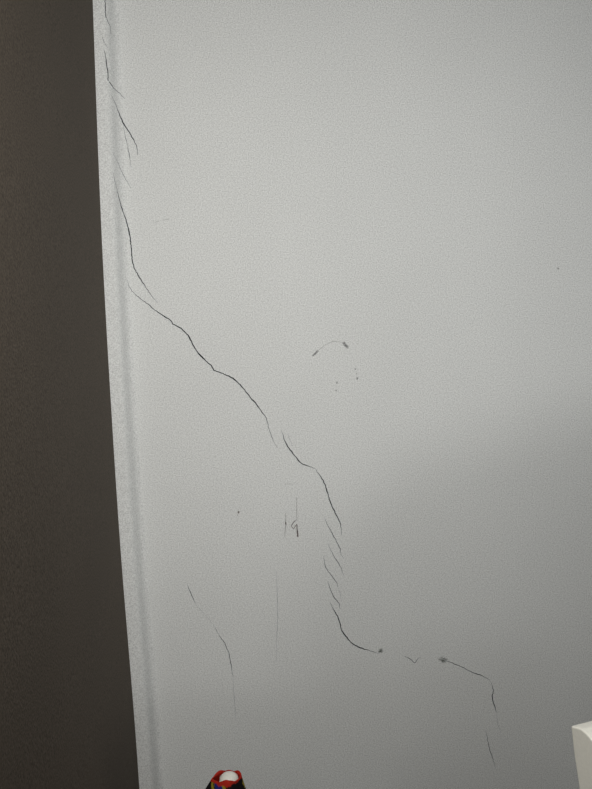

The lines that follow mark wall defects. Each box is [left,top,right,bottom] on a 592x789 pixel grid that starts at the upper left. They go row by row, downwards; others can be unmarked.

crack [102,0,379,662]
crack [187,584,236,717]
crack [405,656,501,768]